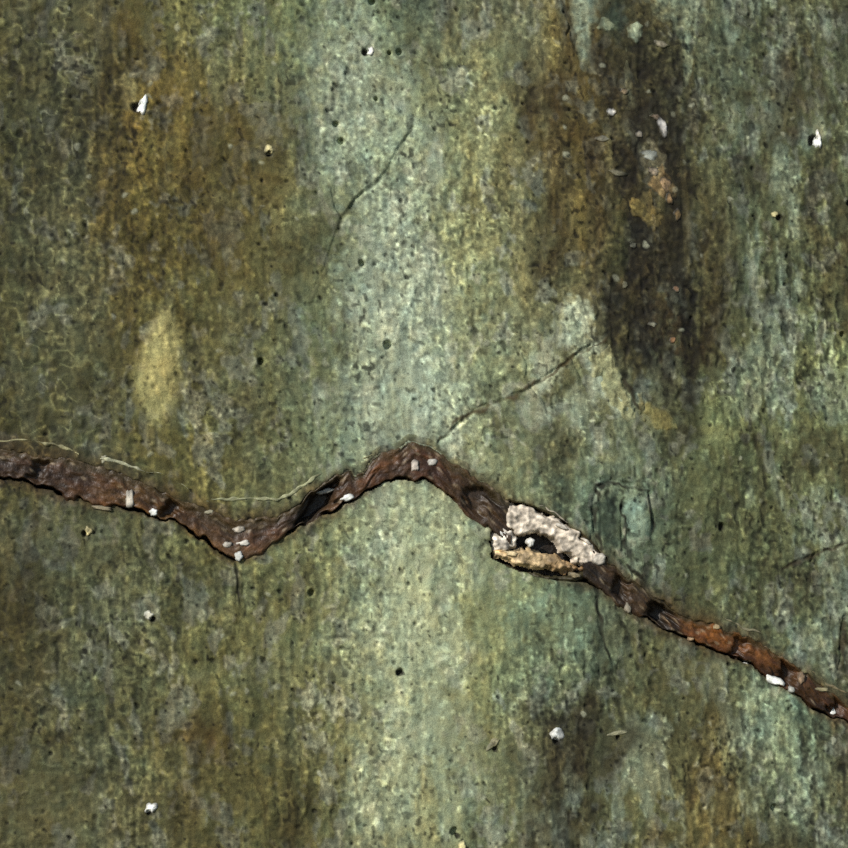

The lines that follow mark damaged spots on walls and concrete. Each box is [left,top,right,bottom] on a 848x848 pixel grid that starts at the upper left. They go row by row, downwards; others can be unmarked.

damp [562,0,752,515]
crack [0,334,609,606]
spalling [489,502,606,582]
damp [591,453,651,582]
crack [540,479,848,723]